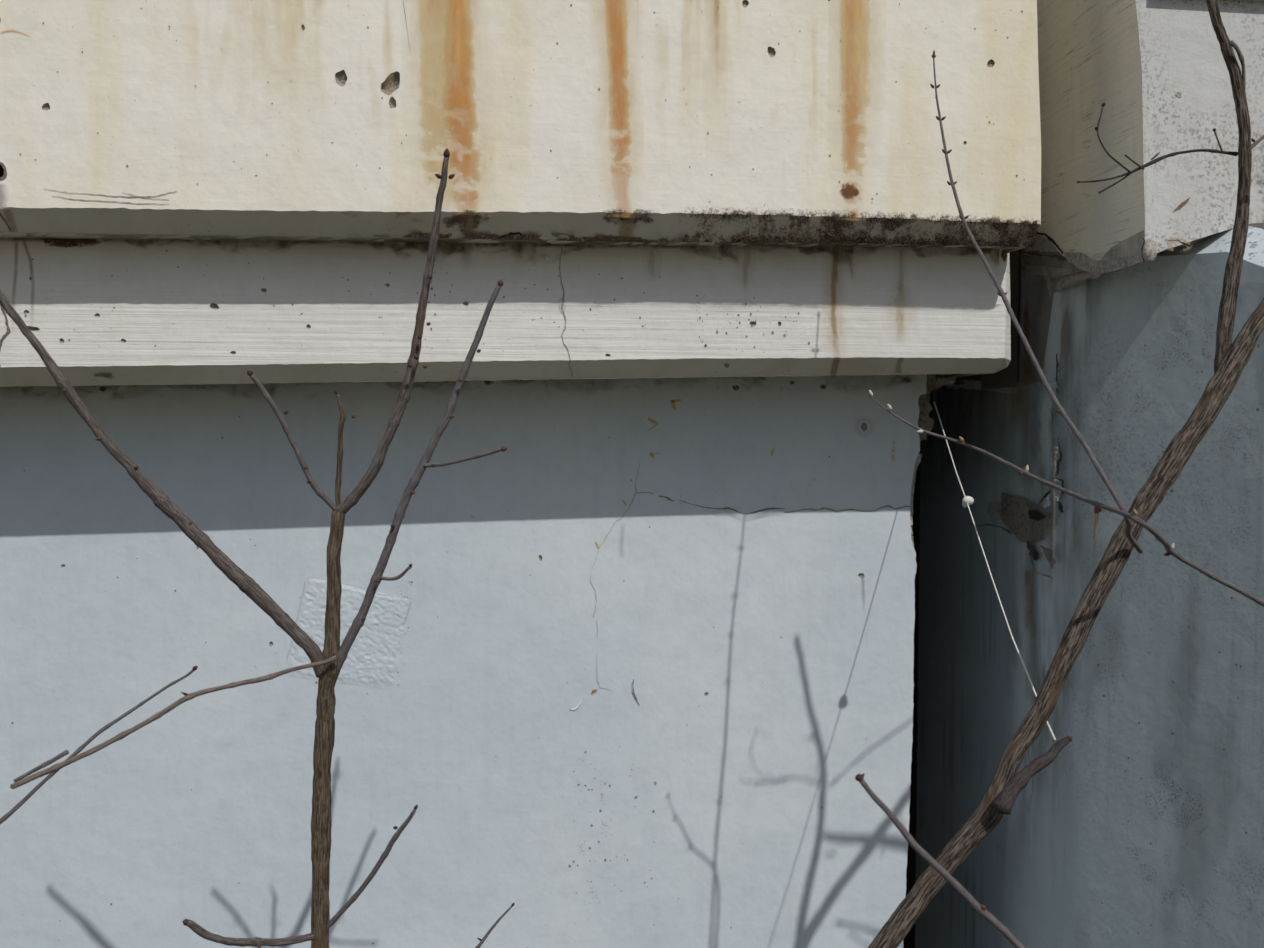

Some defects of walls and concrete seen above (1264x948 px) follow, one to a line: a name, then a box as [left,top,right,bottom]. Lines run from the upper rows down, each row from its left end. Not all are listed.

corrosion [421,0,479,201]
corrosion [605,0,631,172]
corrosion [841,0,870,198]
crack [0,304,11,367]
damp [13,238,110,247]
crack [559,247,573,378]
damp [353,238,1013,257]
crack [590,460,910,691]